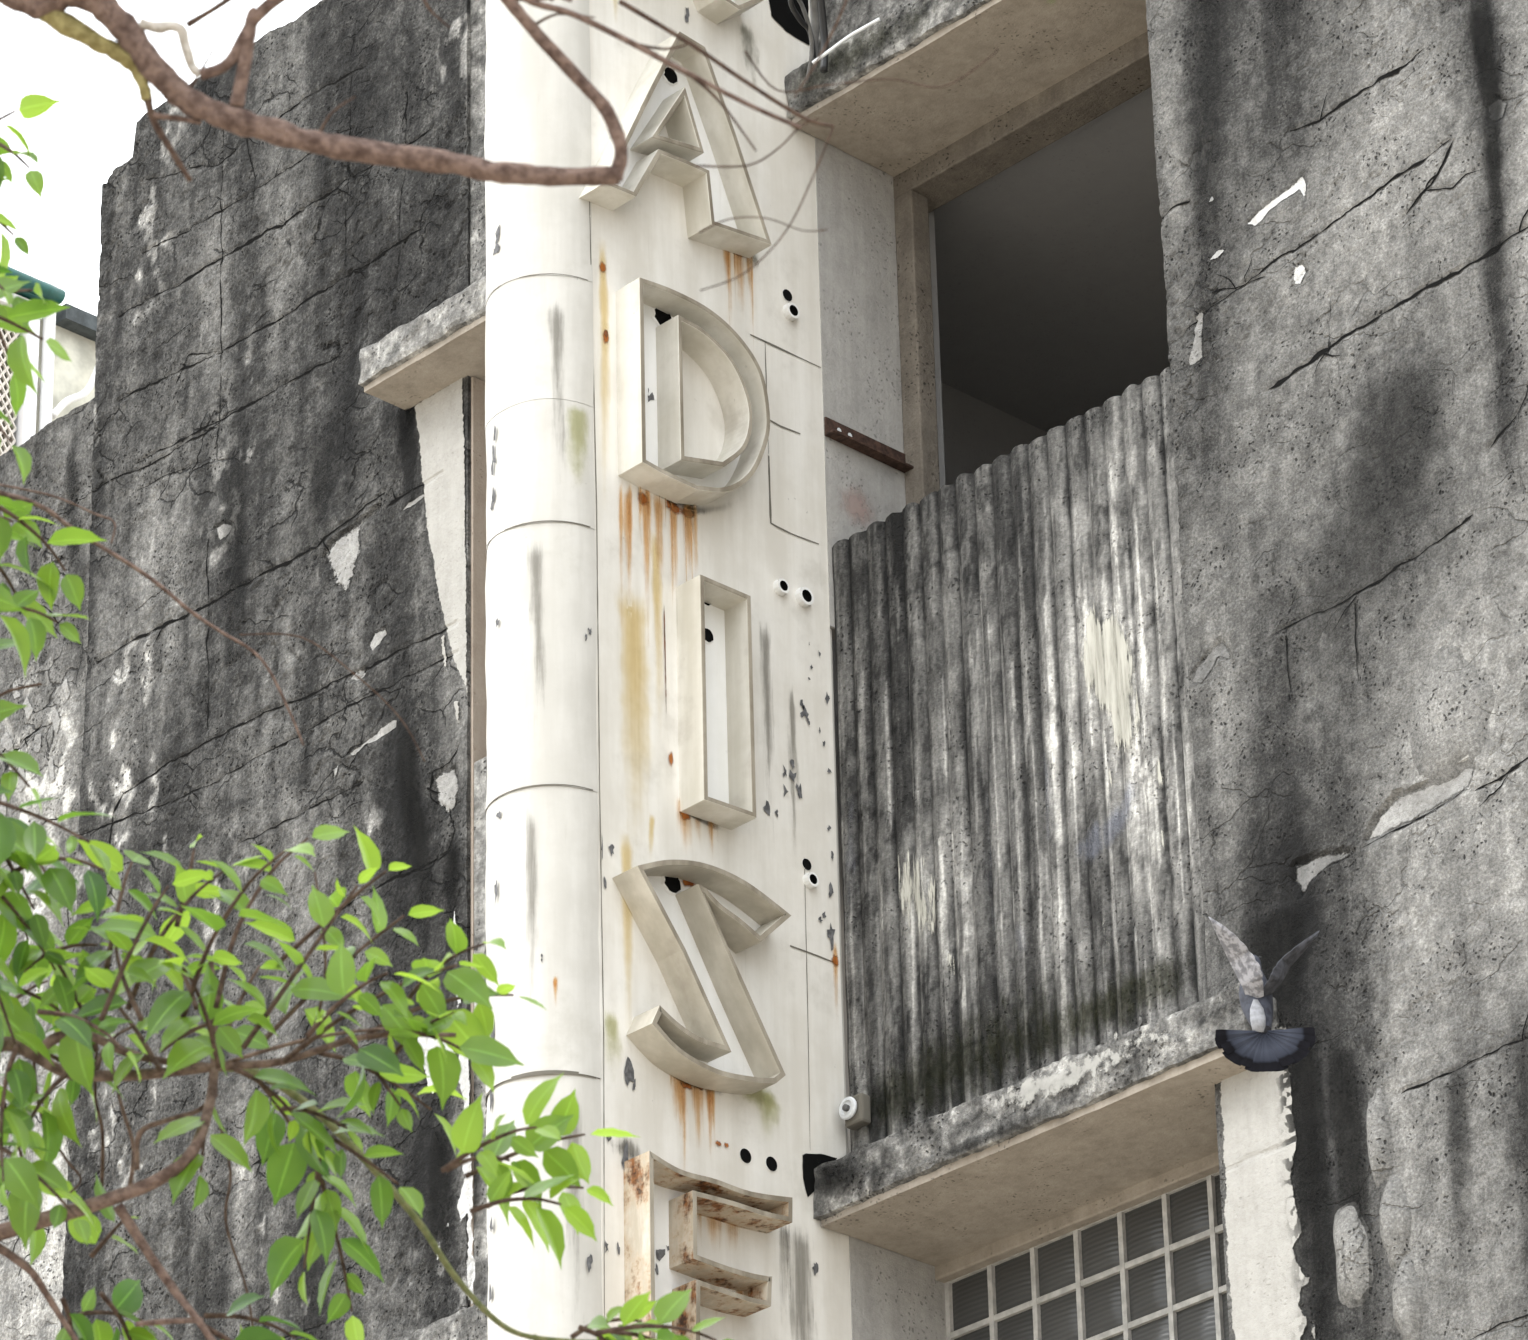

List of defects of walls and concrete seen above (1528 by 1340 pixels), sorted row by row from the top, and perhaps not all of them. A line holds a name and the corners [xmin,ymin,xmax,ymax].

crack [1290,49,1423,131]
spalling [1248,177,1306,226]
crack [1170,139,1479,345]
crack [1268,209,1528,390]
corrosion [667,500,695,517]
spalling [327,526,361,590]
crack [40,484,452,875]
spalling [1370,768,1474,838]
crack [1364,757,1528,847]
peeling [418,1037,470,1109]
water stain [949,1025,1168,1154]
peeling [447,1155,493,1303]